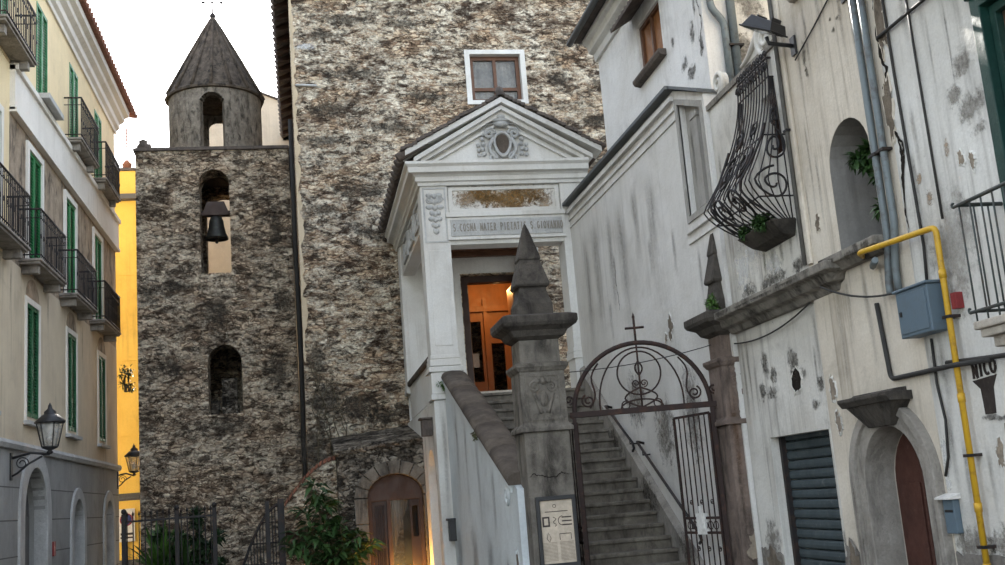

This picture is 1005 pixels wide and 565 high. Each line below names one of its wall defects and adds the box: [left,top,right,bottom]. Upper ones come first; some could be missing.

spalling [790,364,803,397]
peeling [828,374,844,437]